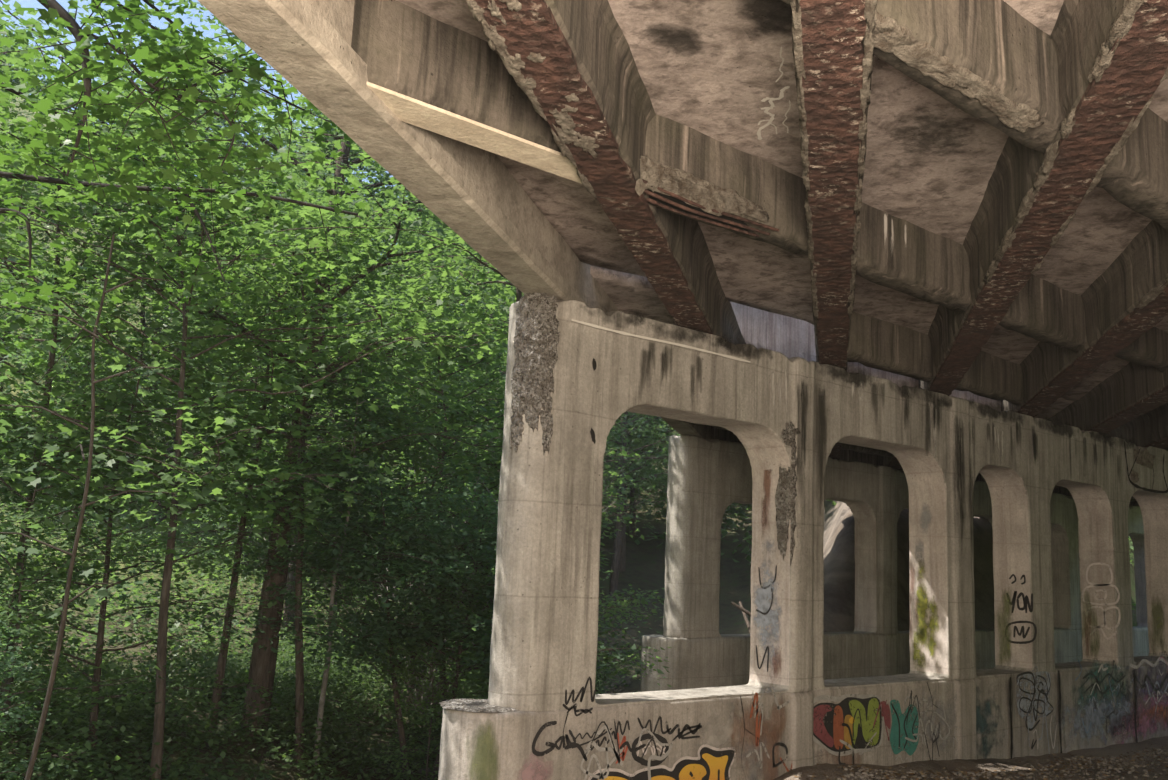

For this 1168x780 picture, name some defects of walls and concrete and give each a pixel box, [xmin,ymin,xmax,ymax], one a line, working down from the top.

rust [487,0,522,25]
rust [510,52,546,90]
rust [548,93,599,159]
spalling [510,292,560,454]
leakage [642,343,668,377]
leakage [926,399,940,450]
leakage [987,422,1036,457]
spalling [775,421,801,566]
leakage [954,428,975,537]